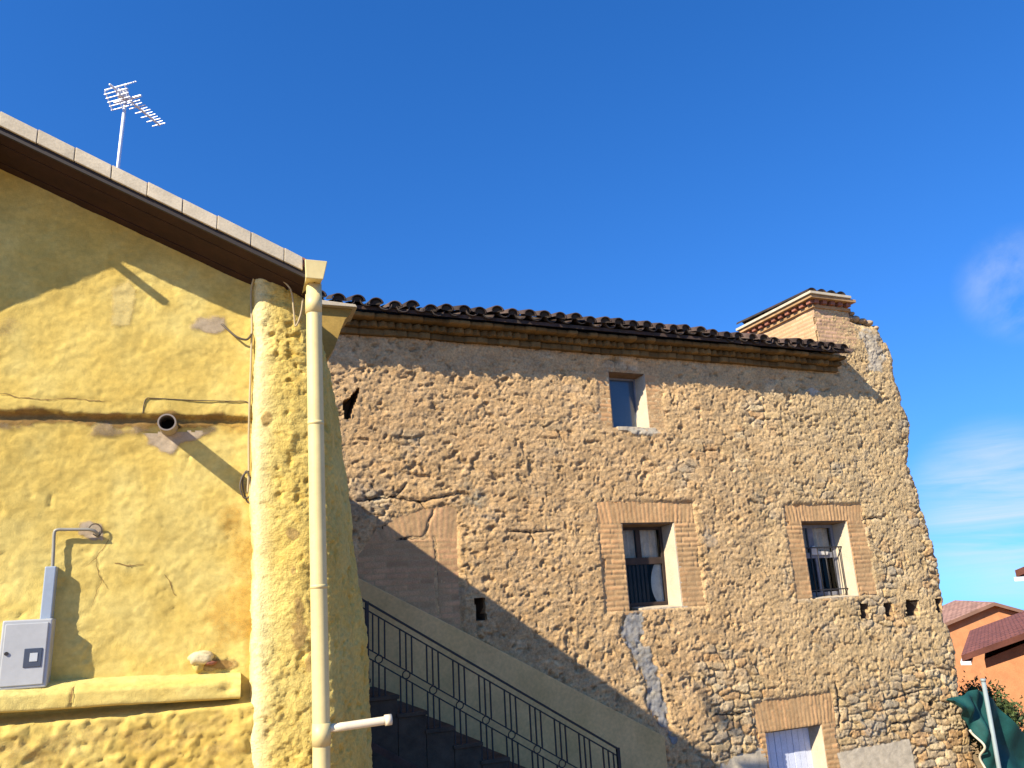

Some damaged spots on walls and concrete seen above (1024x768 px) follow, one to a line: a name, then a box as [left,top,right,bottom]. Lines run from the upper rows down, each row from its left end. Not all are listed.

spalling [343,390,359,420]
crack [357,484,461,558]
crack [86,540,175,608]